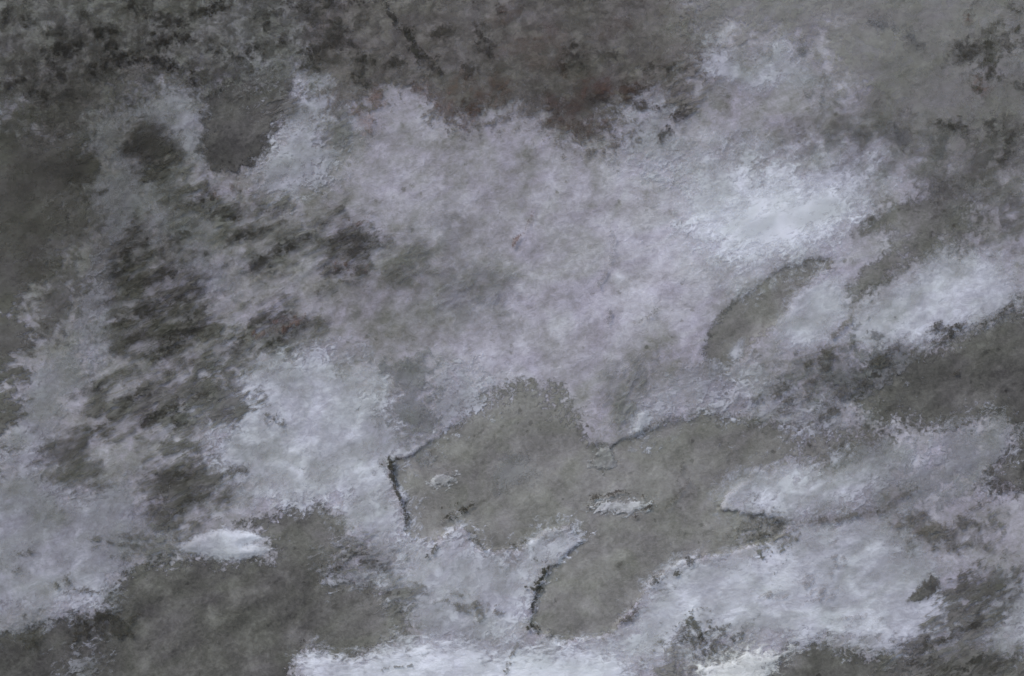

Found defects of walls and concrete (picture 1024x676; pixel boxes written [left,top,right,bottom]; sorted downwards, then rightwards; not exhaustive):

water stain [238,205,393,289]
crack [379,456,410,532]
peeling [0,293,1024,676]
water stain [598,236,1024,676]